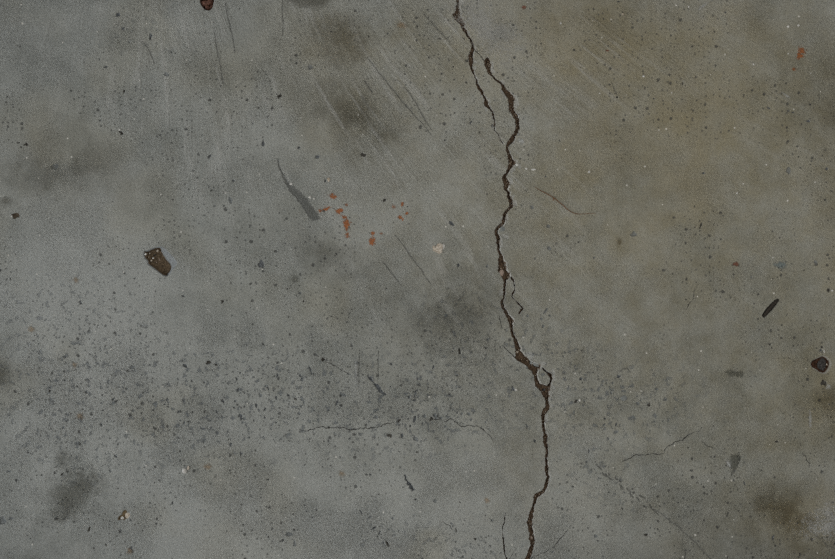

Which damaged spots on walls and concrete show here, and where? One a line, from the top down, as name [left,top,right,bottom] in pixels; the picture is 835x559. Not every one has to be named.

rust [318,193,351,238]
crack [453,0,576,559]
crack [300,414,407,432]
crack [431,418,494,442]